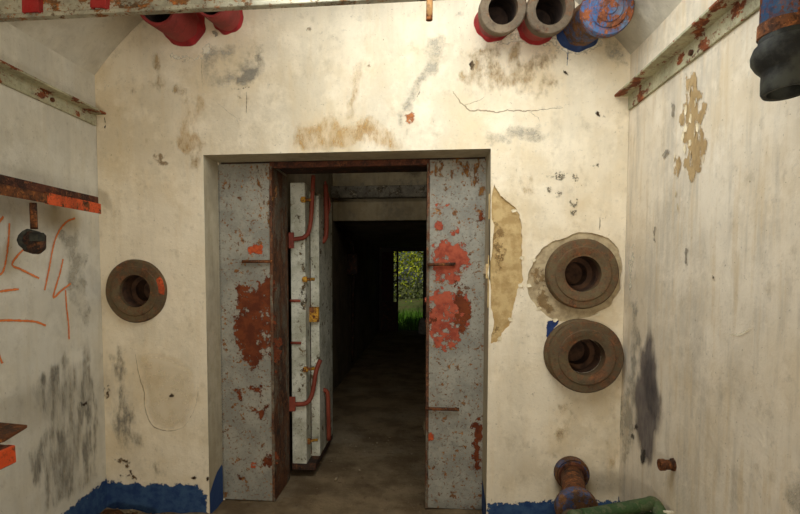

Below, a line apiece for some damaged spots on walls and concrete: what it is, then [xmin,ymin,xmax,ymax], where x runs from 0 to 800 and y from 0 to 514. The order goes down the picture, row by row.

crack [453,92,557,113]
peeling [662,72,707,183]
spalling [486,186,622,343]
leakage [32,370,96,506]